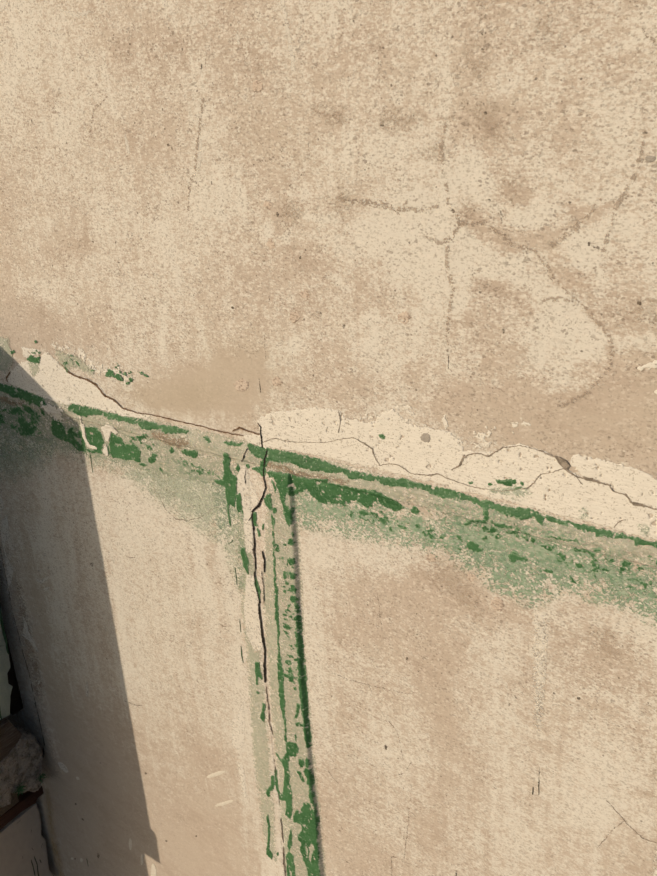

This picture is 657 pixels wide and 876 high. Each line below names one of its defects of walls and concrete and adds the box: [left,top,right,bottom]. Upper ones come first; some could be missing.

peeling [0,339,657,876]
crack [60,363,657,734]
crack [279,819,287,876]
crack [599,800,657,876]